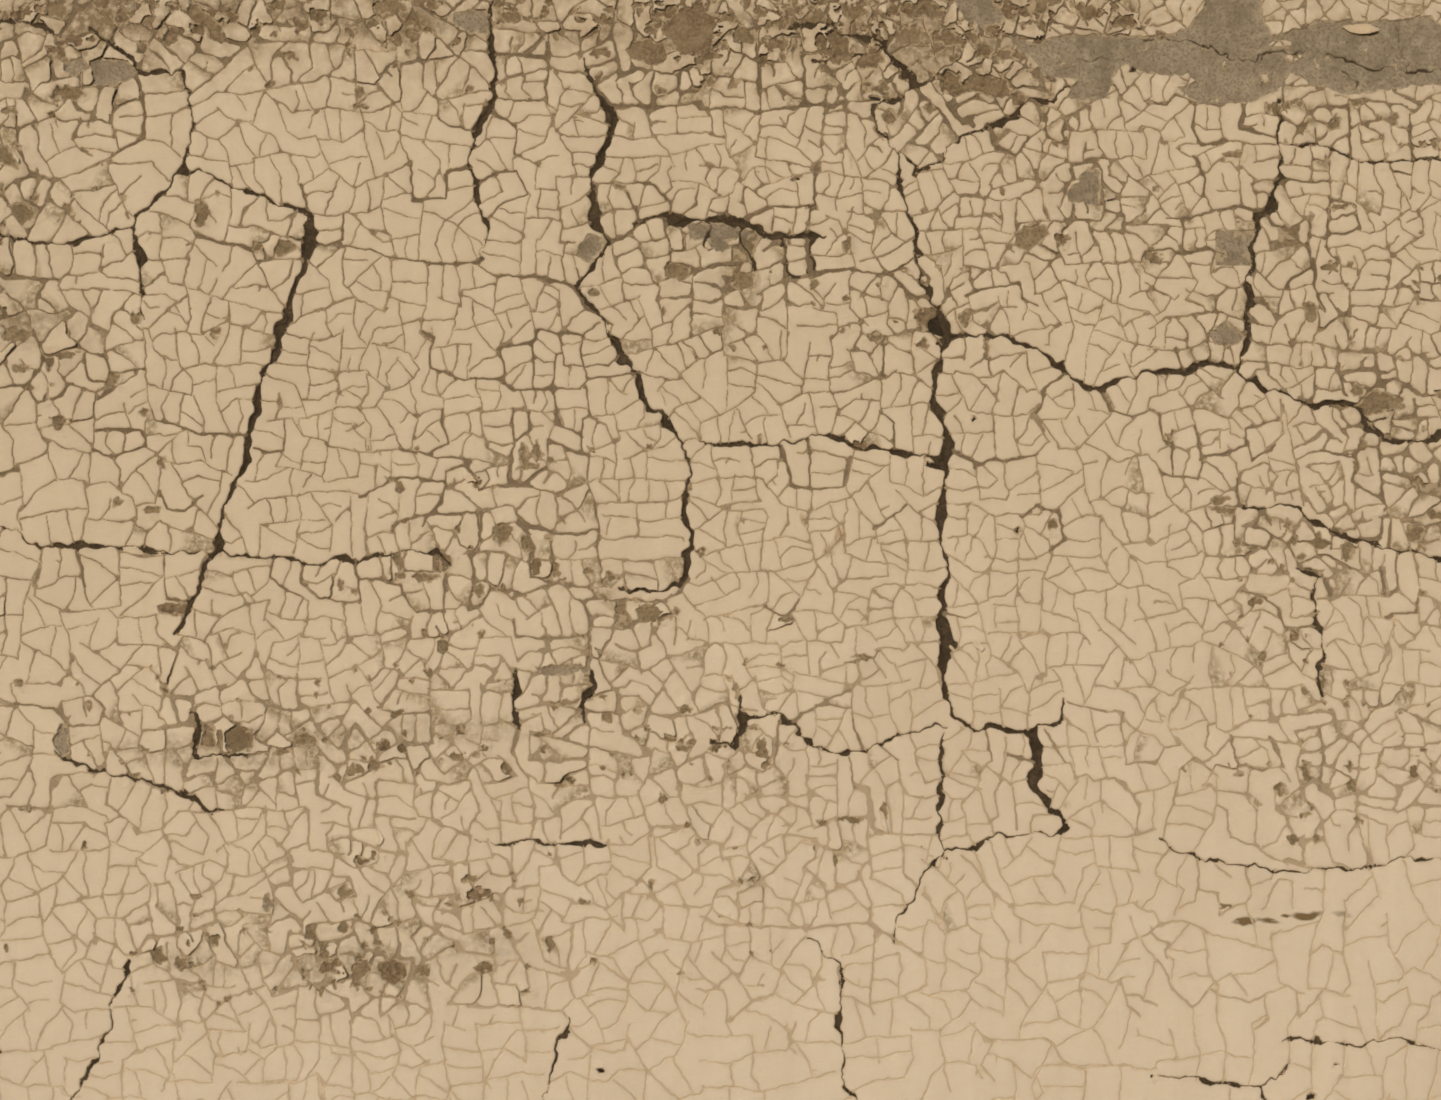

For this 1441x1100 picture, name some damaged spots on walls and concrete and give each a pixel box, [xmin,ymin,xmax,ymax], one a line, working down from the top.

crack [52,0,368,230]
peeling [0,0,1441,145]
peeling [0,183,81,401]
peeling [1312,366,1406,474]
peeling [381,476,589,598]
peeling [535,568,680,723]
peeling [292,906,430,999]
crack [62,1006,211,1100]
crack [548,1023,582,1085]
crack [765,1002,843,1076]
crack [1159,1033,1248,1088]
crack [1250,1029,1326,1100]